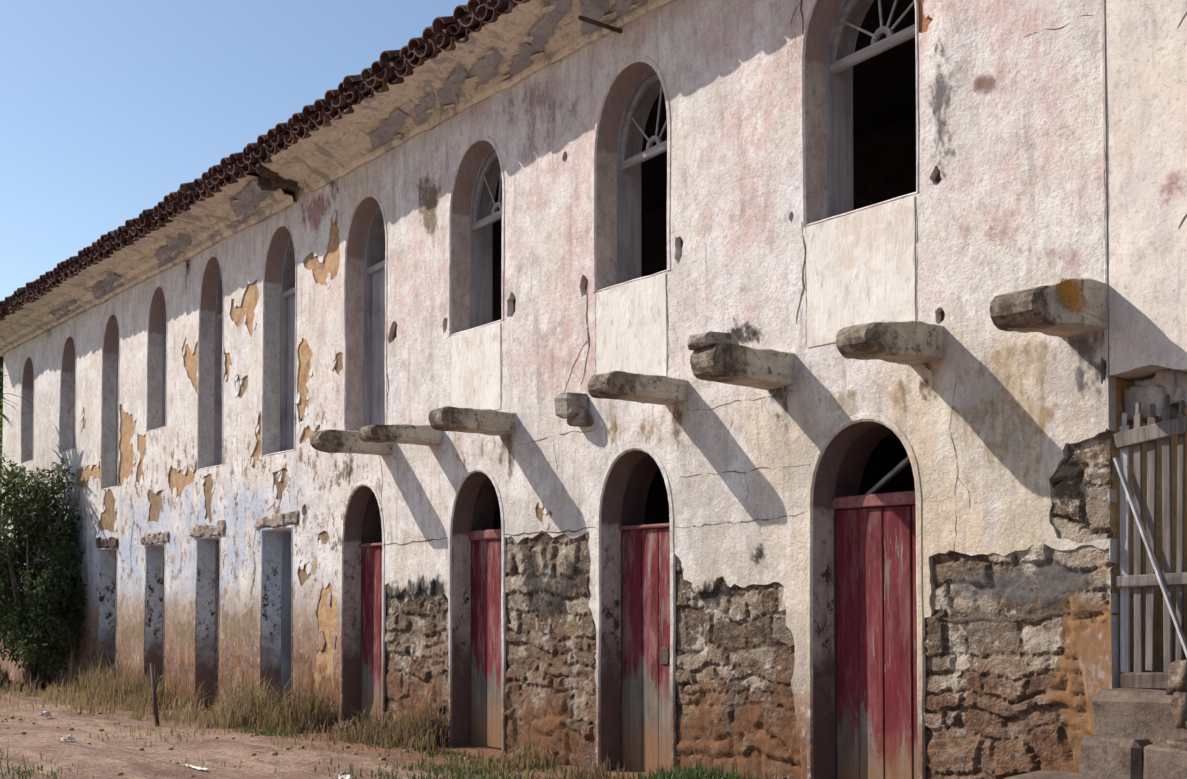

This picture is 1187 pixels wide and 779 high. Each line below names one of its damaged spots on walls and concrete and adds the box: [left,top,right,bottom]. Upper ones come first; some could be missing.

peeling [365,0,648,155]
crack [790,0,804,36]
leakage [930,44,954,177]
peeling [304,209,340,290]
crack [796,222,807,324]
peeling [295,338,320,443]
peeling [76,404,214,532]
leakage [295,656,340,727]
flaking render [384,581,449,746]
flaking render [504,500,596,770]
flaking render [675,555,801,779]
flaking render [922,430,1115,779]